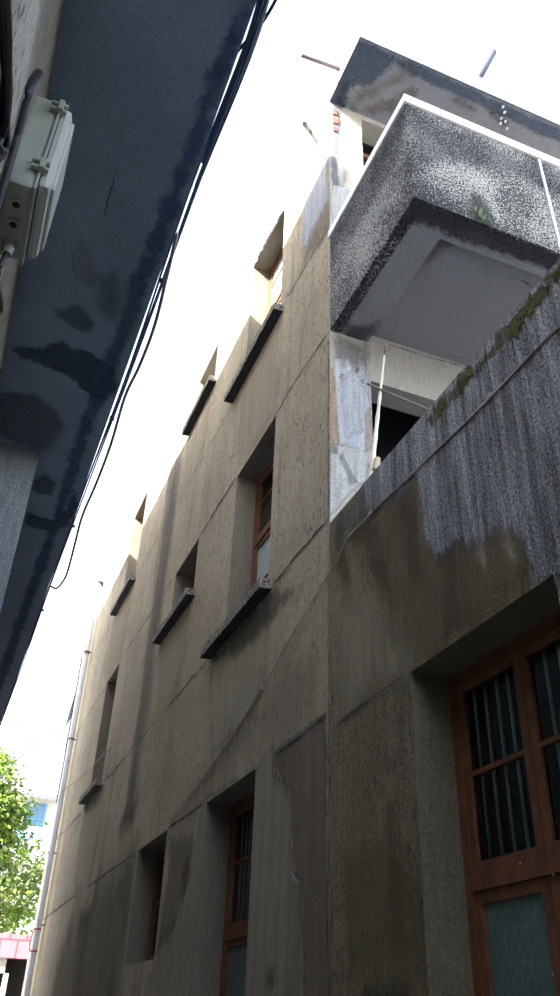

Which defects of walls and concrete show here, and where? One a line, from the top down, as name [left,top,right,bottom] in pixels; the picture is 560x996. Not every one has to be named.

water stain [0,0,249,689]
water stain [98,40,560,835]